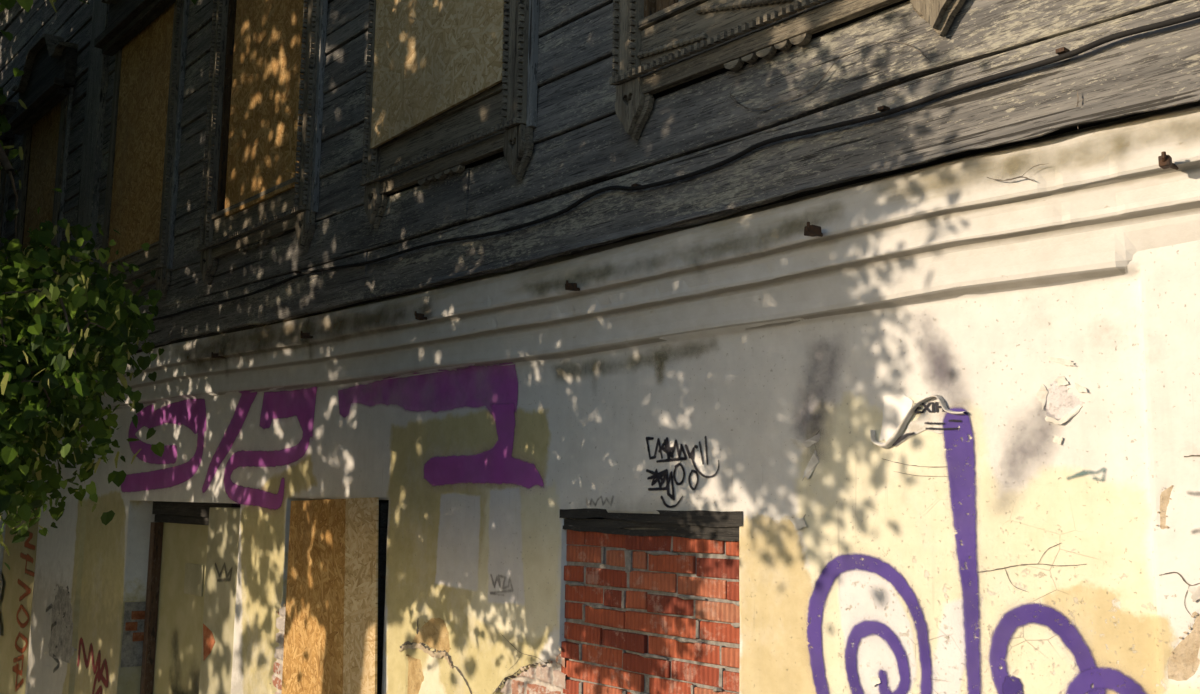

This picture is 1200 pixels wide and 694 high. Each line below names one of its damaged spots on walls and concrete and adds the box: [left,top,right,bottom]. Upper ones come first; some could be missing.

flaking render [1156,485,1173,529]
flaking render [121,601,146,668]
flaking render [269,603,286,694]
flaking render [406,618,451,694]
flaking render [500,647,567,694]
flaking render [1167,611,1200,681]